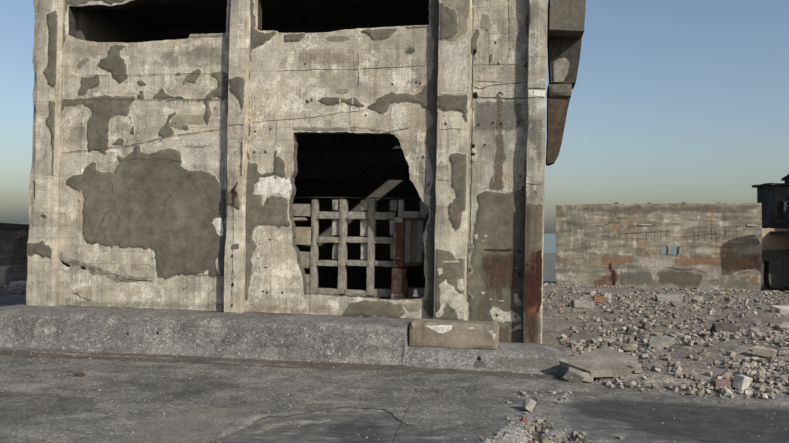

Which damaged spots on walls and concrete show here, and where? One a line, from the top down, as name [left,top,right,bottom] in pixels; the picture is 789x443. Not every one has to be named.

crack [284,54,426,86]
flaking render [43,0,306,302]
flaking render [306,0,545,344]
damp [475,95,542,190]
flaking render [27,239,53,259]
rust [499,327,509,342]
rust [525,250,542,342]